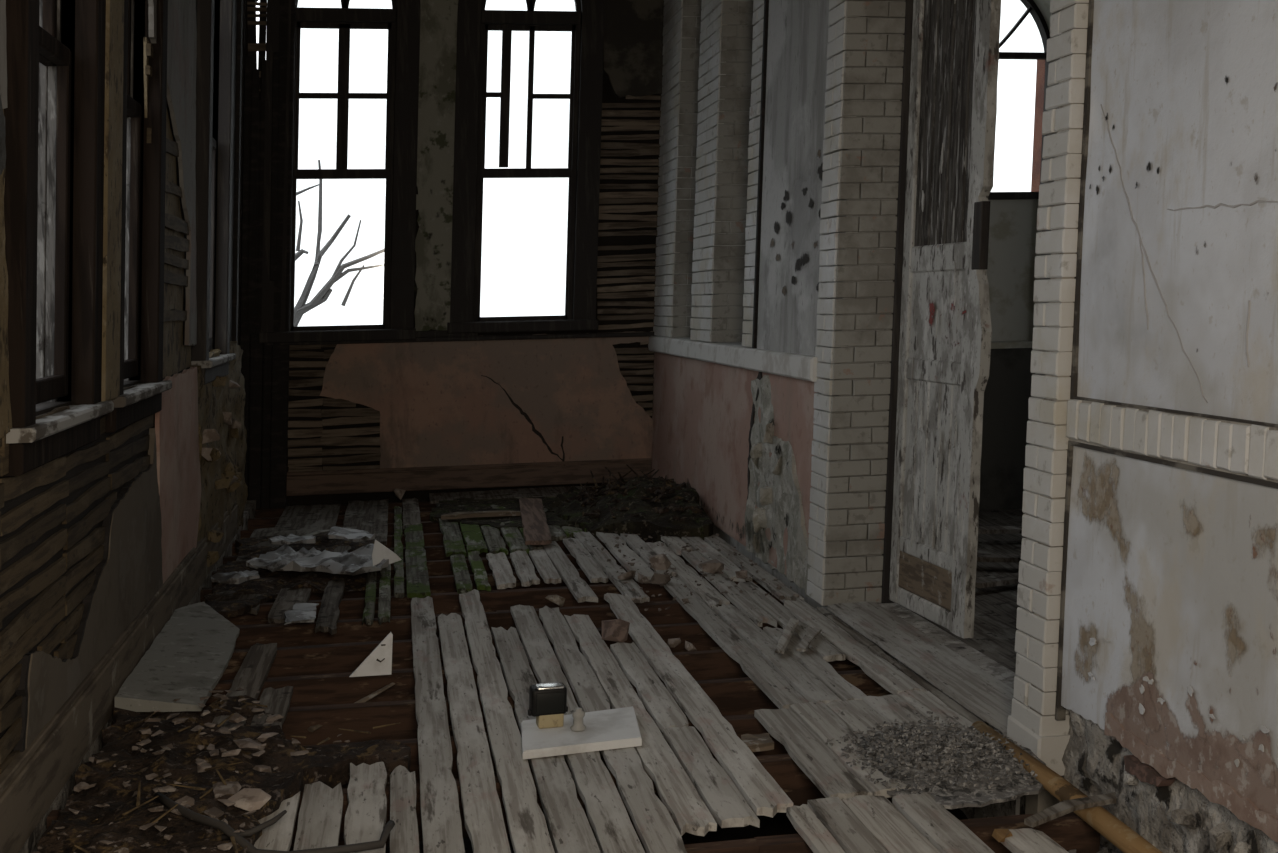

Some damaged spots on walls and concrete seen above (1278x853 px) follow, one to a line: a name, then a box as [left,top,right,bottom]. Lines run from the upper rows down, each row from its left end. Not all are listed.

flaking render [0,166,153,774]
spalling [143,37,248,567]
crack [481,375,565,462]
flaking render [597,94,661,418]
spalling [744,375,813,597]
flaking render [1077,455,1130,563]
crack [1101,104,1208,403]
crack [1167,200,1278,211]
flaking render [1075,578,1278,853]